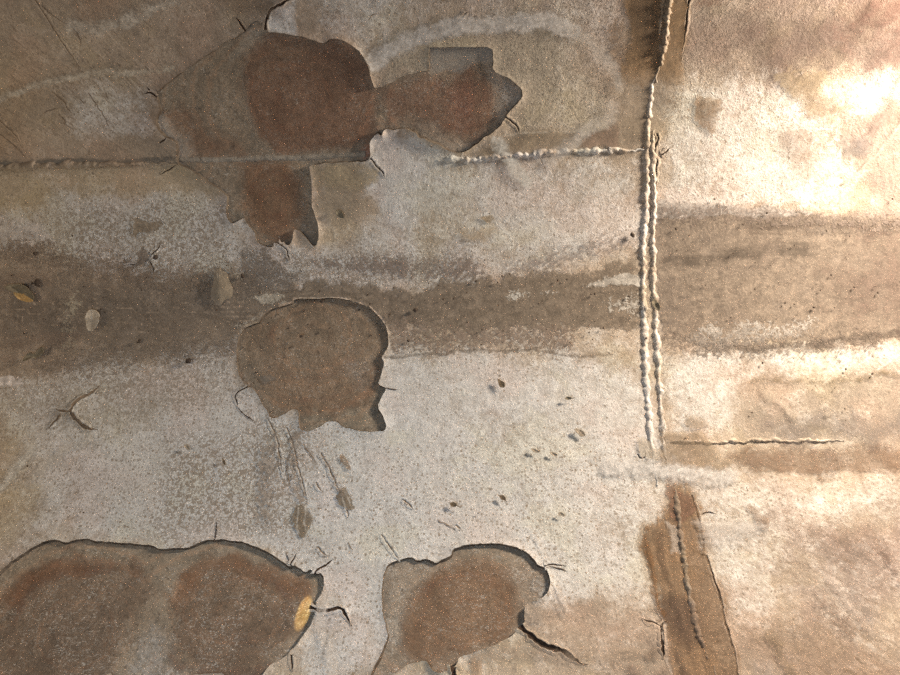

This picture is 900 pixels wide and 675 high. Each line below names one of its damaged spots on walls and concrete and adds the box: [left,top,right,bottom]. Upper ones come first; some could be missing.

crack [659,0,693,61]
peeling [156,21,523,247]
crack [650,133,671,189]
leakage [656,198,813,219]
peeling [236,298,389,432]
leakage [689,315,819,356]
peeling [0,539,324,675]
peeling [371,543,550,675]
crack [642,616,679,659]
crack [687,494,742,675]